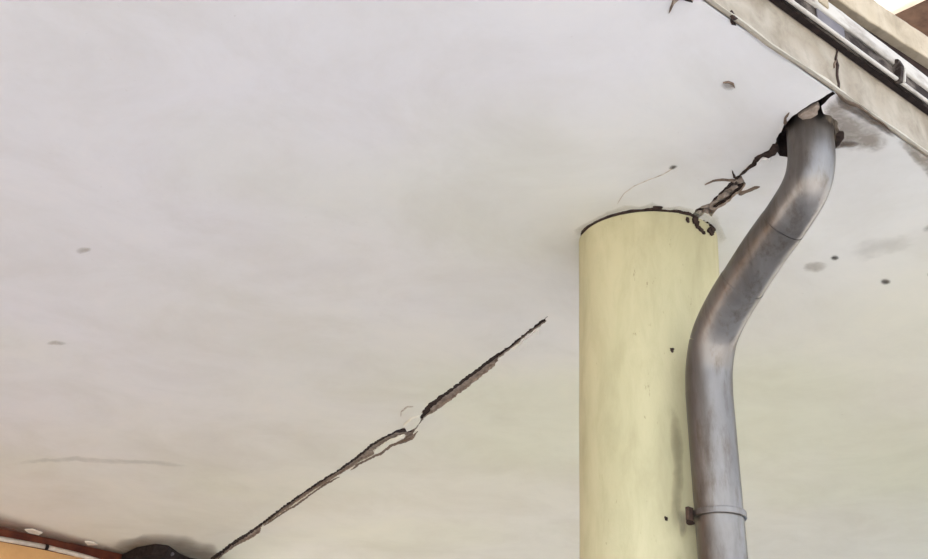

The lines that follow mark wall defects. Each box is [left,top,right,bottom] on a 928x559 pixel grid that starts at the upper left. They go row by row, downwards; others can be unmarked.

crack [832,49,840,88]
crack [767,113,789,156]
crack [835,131,844,149]
leakage [829,92,892,148]
crack [212,316,548,559]